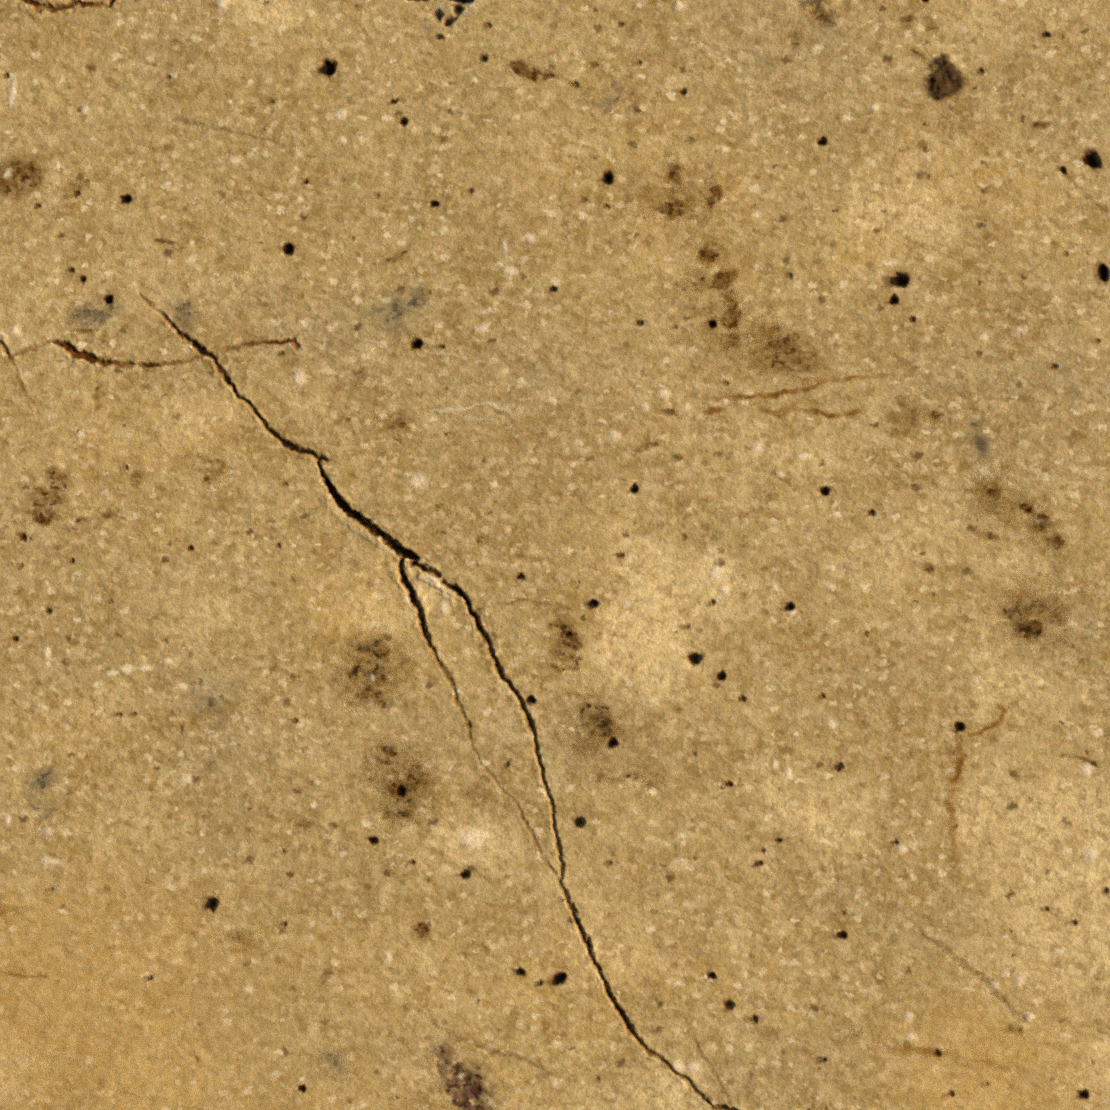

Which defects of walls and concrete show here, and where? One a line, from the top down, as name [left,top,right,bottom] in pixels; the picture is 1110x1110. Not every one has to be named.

crack [23,0,115,12]
crack [47,318,562,859]
damp [1003,601,1054,638]
damp [348,640,388,708]
damp [383,746,427,818]
crack [564,890,736,1110]